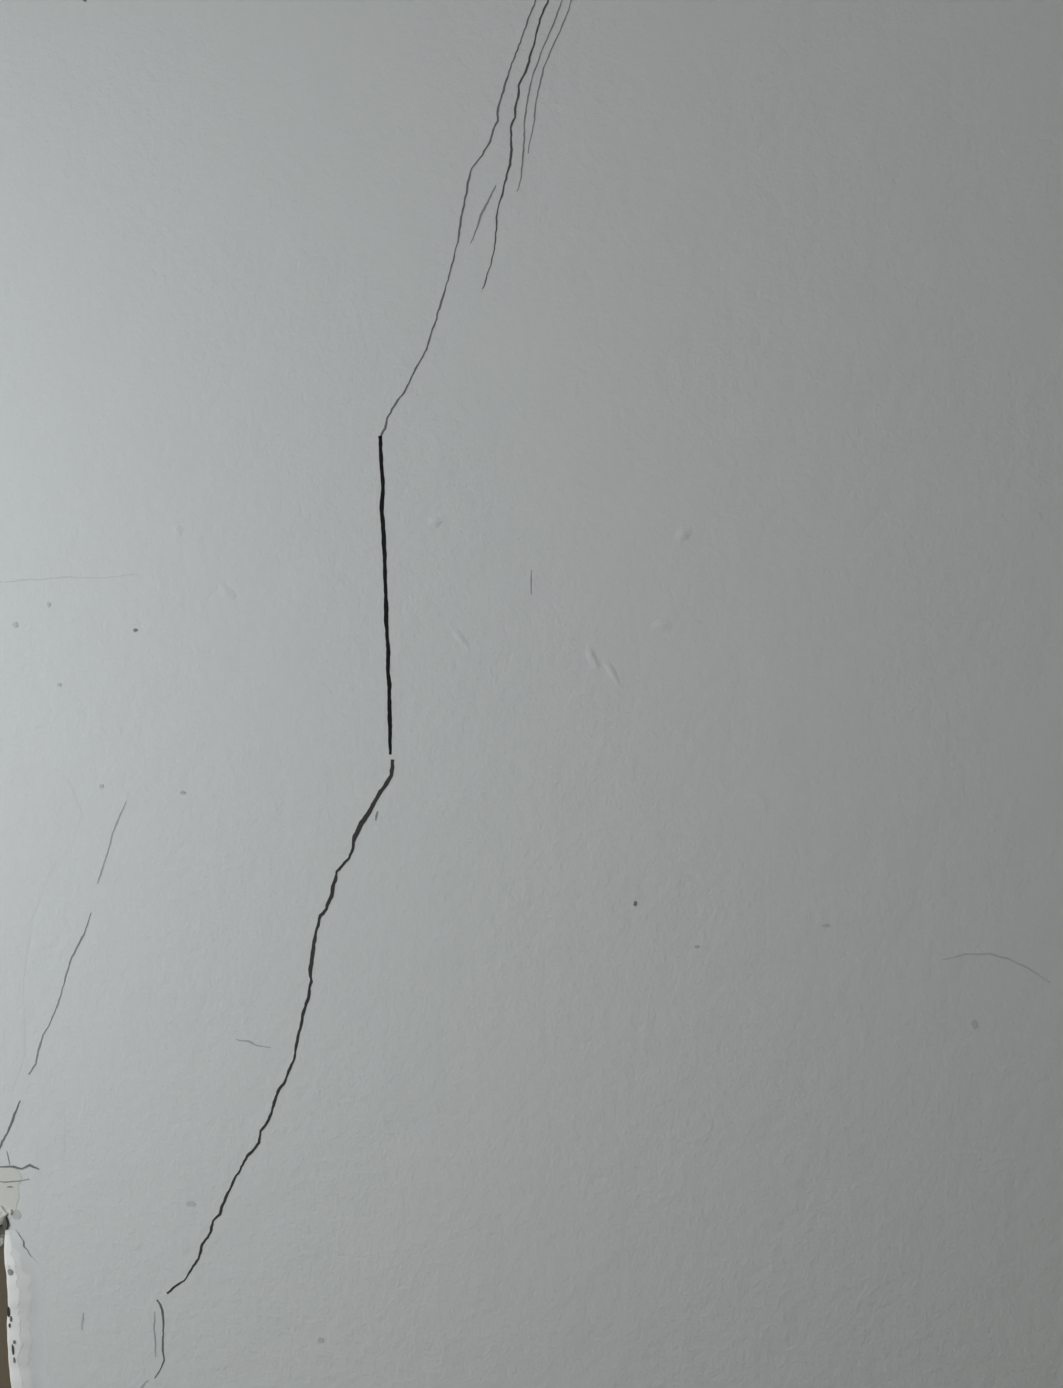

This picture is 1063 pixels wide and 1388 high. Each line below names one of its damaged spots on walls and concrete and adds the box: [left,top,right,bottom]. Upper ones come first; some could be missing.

crack [140,0,572,1388]